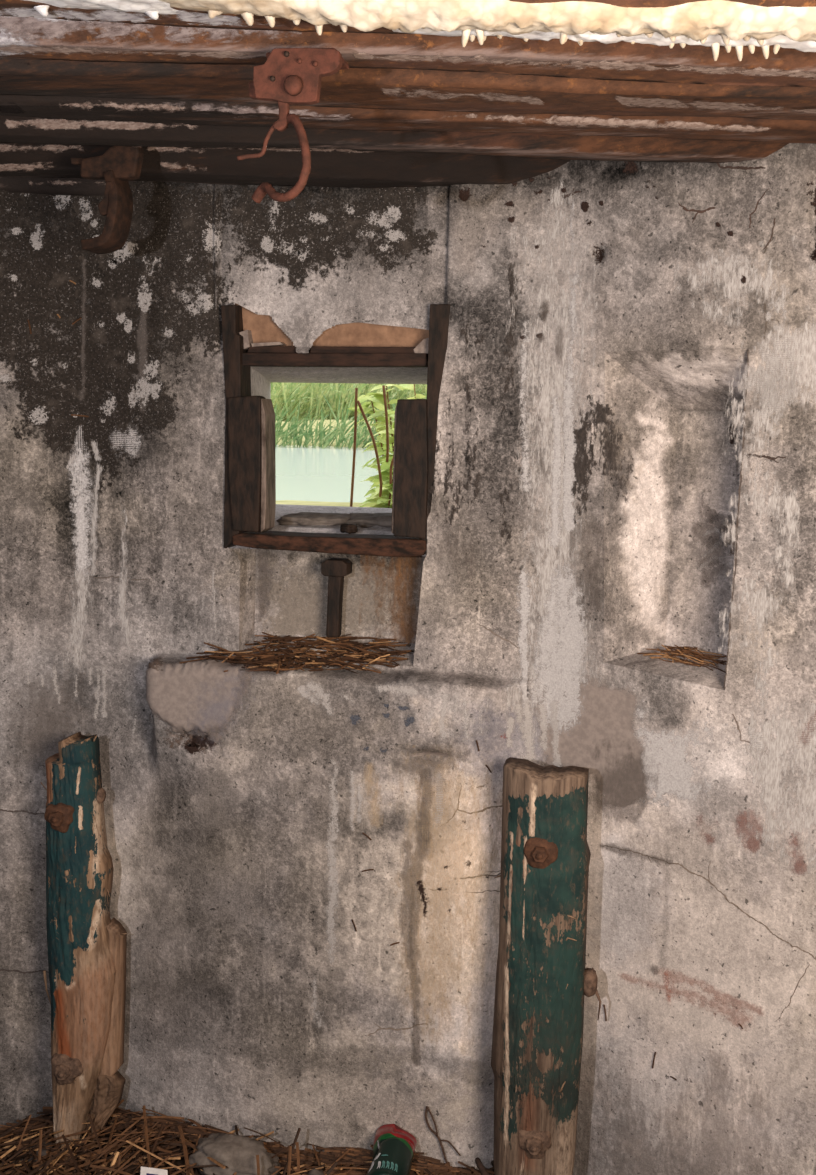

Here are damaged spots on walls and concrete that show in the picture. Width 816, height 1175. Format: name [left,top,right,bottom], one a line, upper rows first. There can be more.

water stain [0,0,816,80]
water stain [0,102,346,130]
water stain [382,88,544,105]
water stain [468,96,816,133]
water stain [0,144,442,719]
water stain [427,183,634,767]
water stain [326,761,362,963]
water stain [416,881,429,917]
crack [602,845,816,1019]